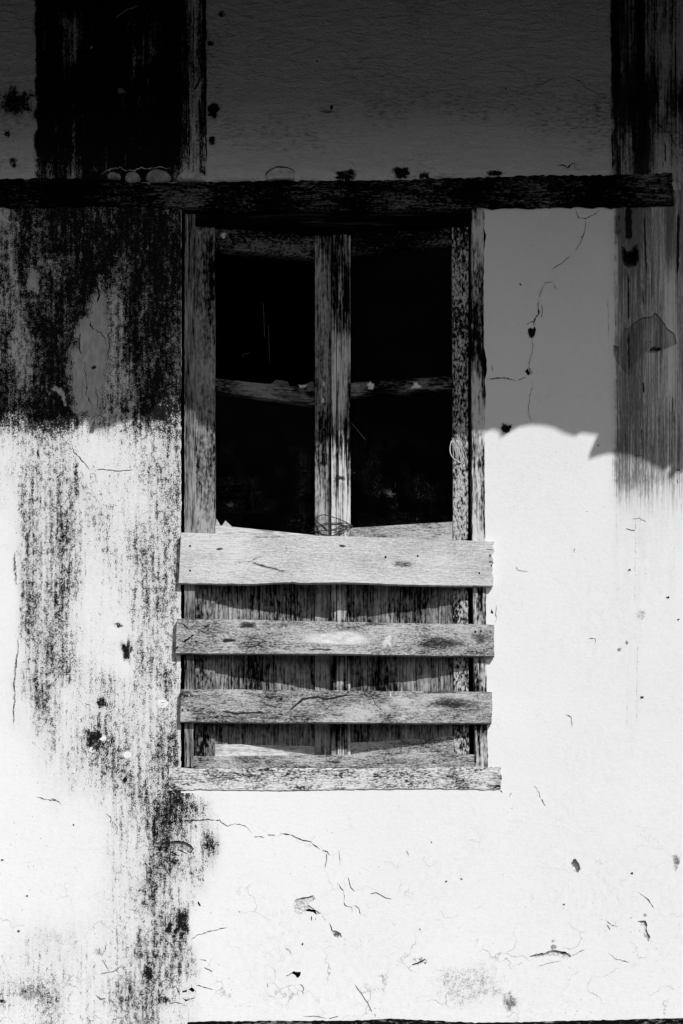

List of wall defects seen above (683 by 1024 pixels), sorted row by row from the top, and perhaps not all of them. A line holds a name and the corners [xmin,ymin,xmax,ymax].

water stain [0,0,226,182]
crack [492,208,596,418]
flaking render [613,313,677,375]
water stain [0,206,213,1024]
crack [180,819,391,914]
spalling [293,895,342,938]
spalling [530,940,583,966]